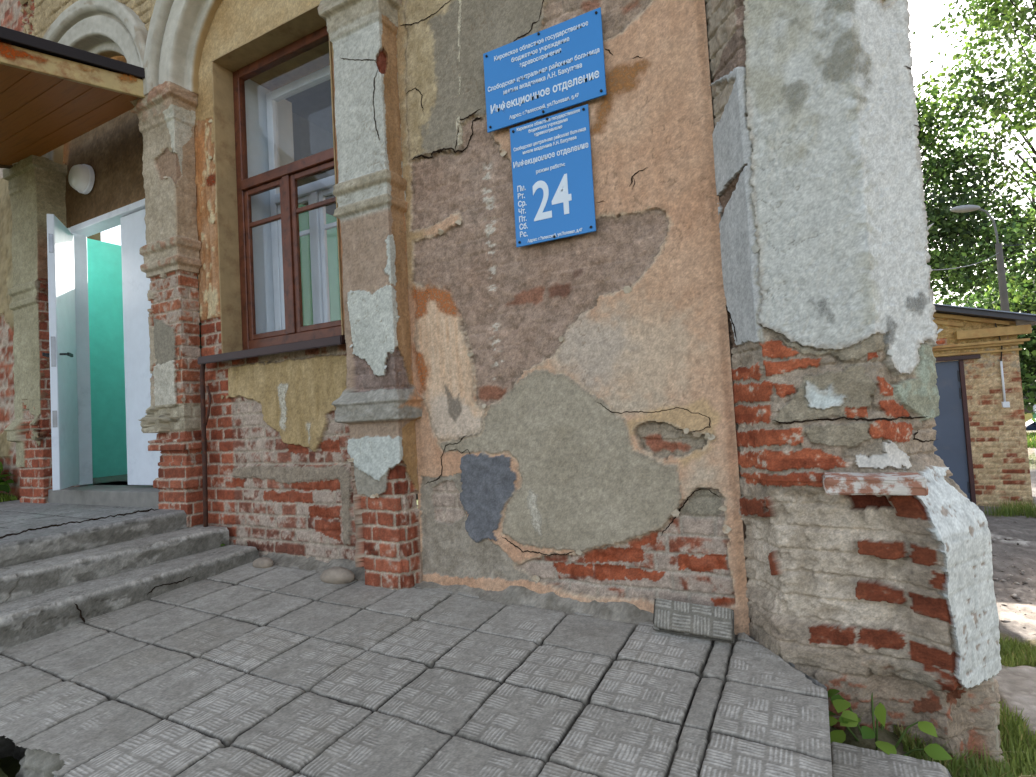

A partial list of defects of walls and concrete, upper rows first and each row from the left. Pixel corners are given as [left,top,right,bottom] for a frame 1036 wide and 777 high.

flaking render [542,0,652,41]
flaking render [411,115,669,409]
flaking render [146,116,421,590]
flaking render [432,480,465,523]
crack [0,508,158,539]
flaking render [517,323,1006,767]
crack [147,576,193,595]